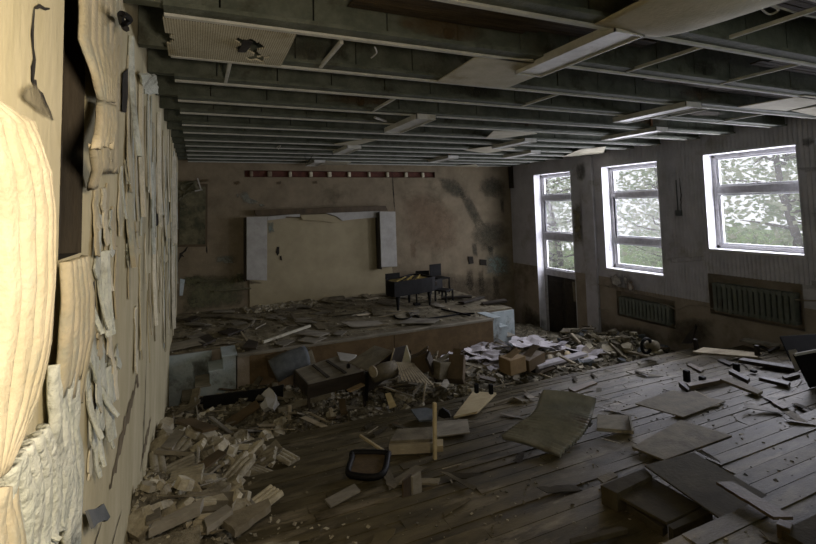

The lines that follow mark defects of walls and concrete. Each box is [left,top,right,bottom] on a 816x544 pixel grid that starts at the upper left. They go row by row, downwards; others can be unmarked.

flaking render [0,0,200,544]
damp [441,180,504,255]